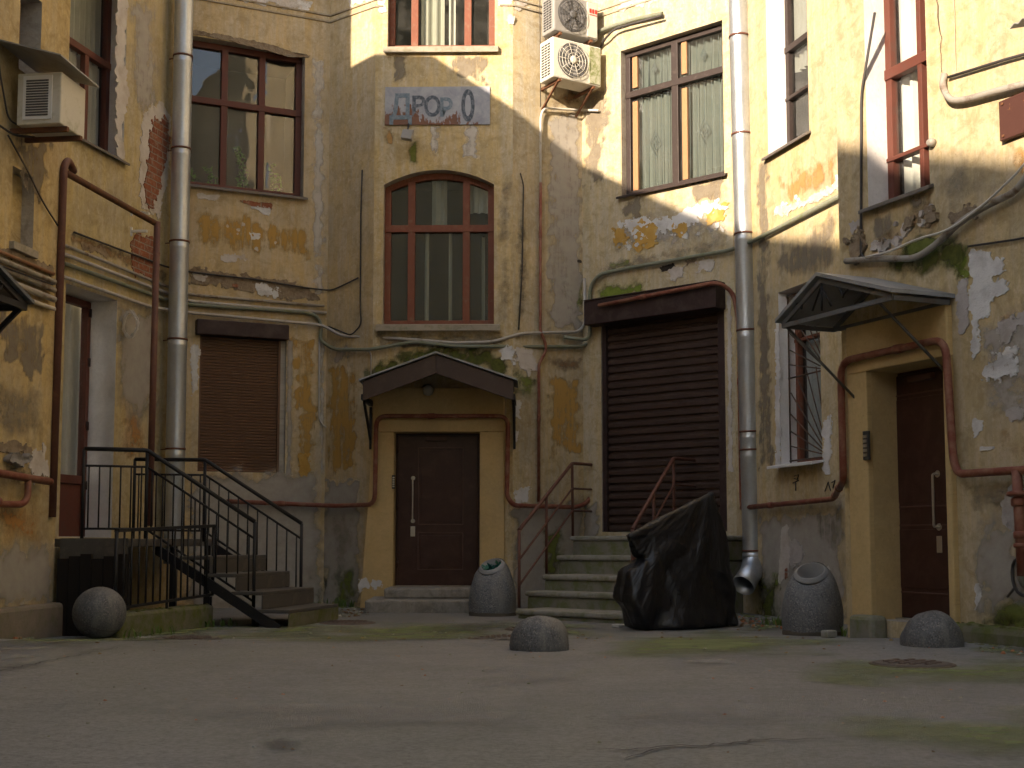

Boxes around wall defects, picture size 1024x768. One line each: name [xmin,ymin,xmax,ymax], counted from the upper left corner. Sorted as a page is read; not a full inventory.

peeling [114,0,130,160]
spalling [138,101,172,219]
spalling [130,233,160,279]
spalling [188,222,320,302]
peeling [611,198,729,255]
spalling [870,202,979,255]
peeling [955,248,1024,422]
spalling [0,440,50,485]
peeling [972,418,995,451]
crack [620,738,823,758]